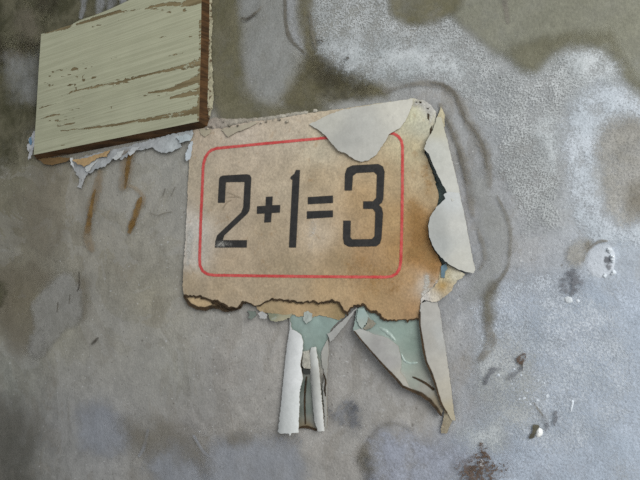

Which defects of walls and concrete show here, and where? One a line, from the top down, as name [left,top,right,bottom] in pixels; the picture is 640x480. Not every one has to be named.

peeling [27,131,35,160]
corrosion [124,154,133,189]
peeling [70,129,211,188]
corrosion [85,190,96,233]
corrosion [128,197,142,234]
damp [211,0,640,480]